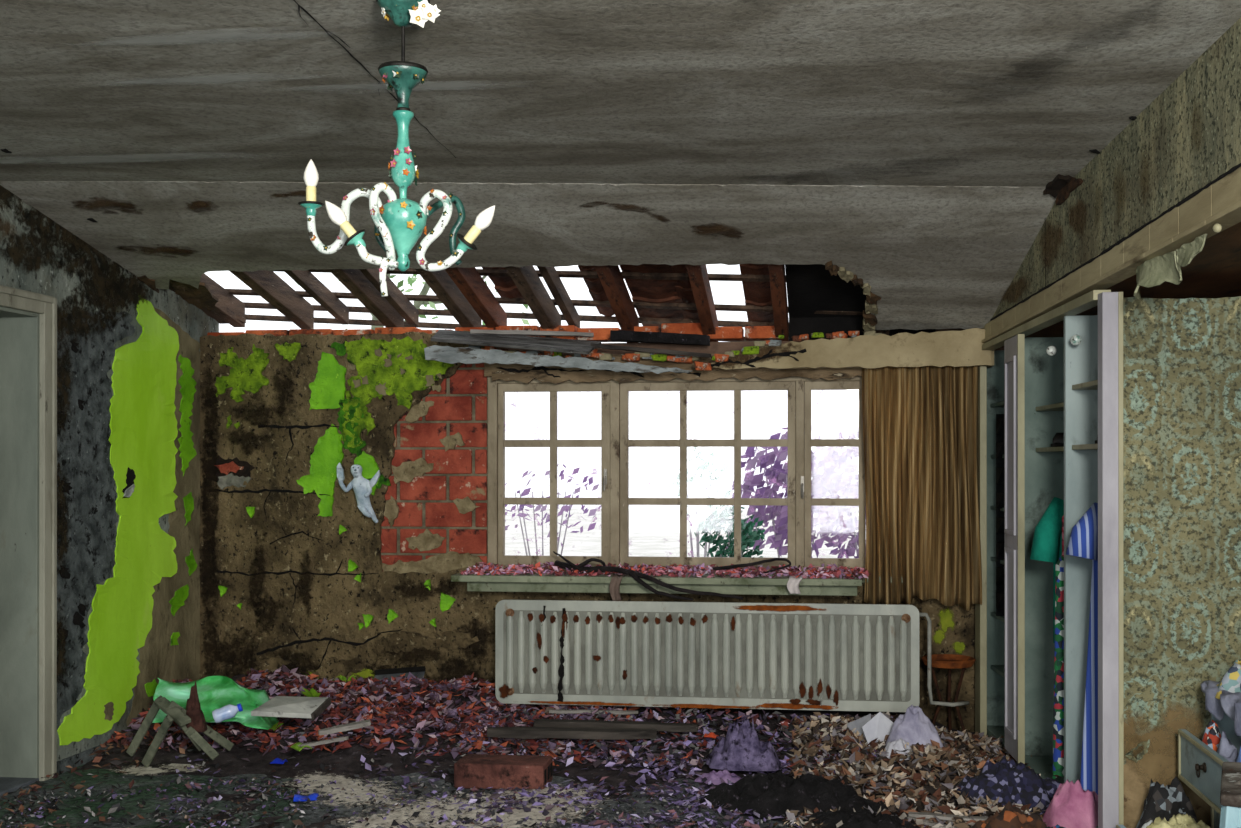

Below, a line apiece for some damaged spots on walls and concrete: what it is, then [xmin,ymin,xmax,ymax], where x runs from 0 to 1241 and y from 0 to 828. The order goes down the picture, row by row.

crack [293,0,456,158]
leakage [0,154,195,163]
leakage [0,185,197,442]
peeling [825,261,881,331]
peeling [309,352,347,410]
crack [258,424,339,459]
leakage [57,463,71,574]
peeling [57,275,255,745]
flaking render [296,363,488,653]
crack [210,489,402,671]
leakage [57,598,68,697]
flaking render [308,657,367,681]